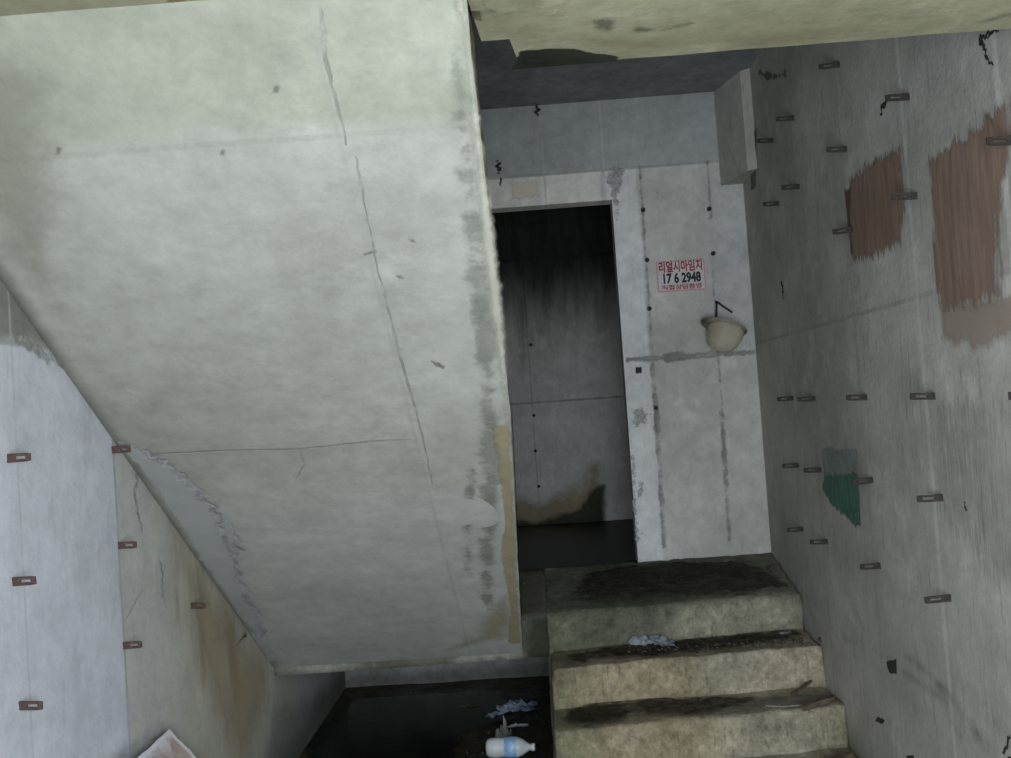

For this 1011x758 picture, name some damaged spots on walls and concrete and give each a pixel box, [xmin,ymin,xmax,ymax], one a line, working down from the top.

crack [979,30,999,65]
crack [133,6,433,533]
peeling [844,145,905,261]
peeling [928,99,1011,347]
leakage [474,295,494,376]
leakage [515,481,605,527]